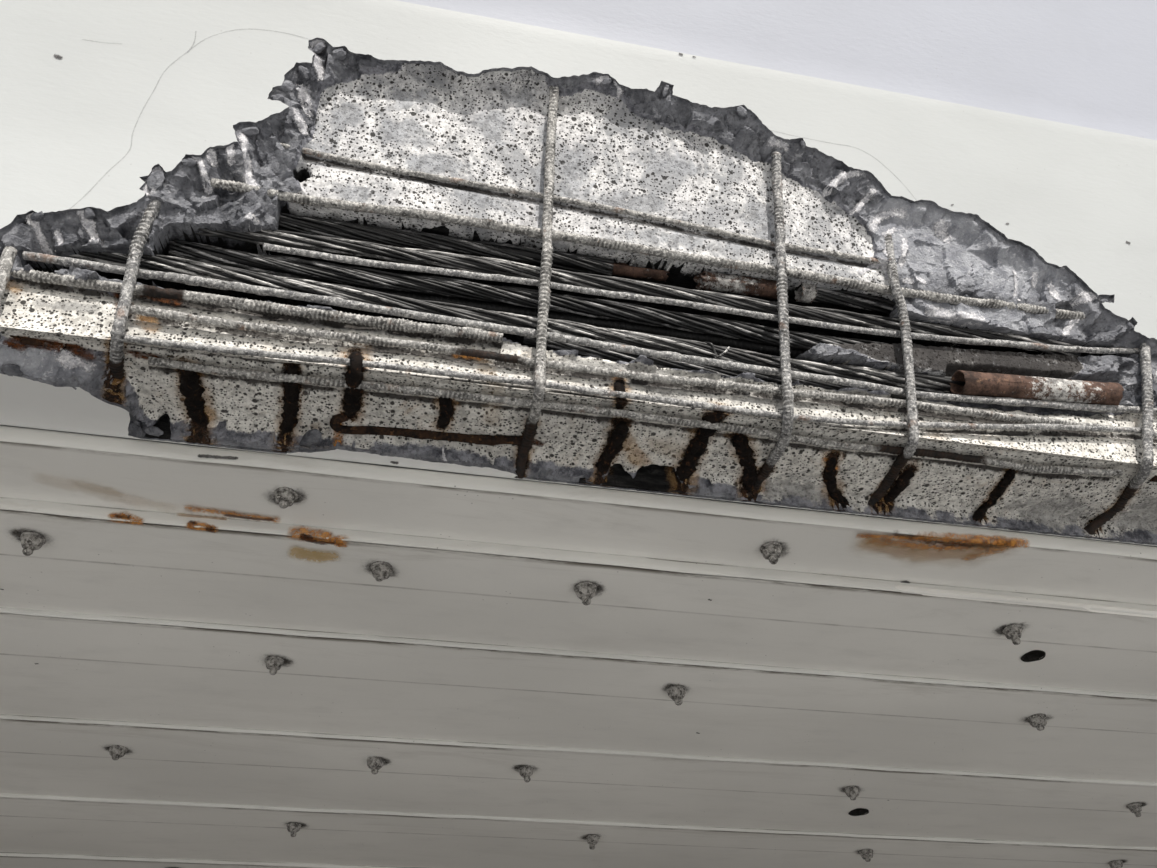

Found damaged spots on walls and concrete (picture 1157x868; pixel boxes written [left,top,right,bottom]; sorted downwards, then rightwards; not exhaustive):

corrosion [113,292,181,314]
spalling [0,40,1157,544]
corrosion [127,350,162,359]
corrosion [185,506,278,533]
corrosion [290,527,347,561]
corrosion [857,533,1028,561]